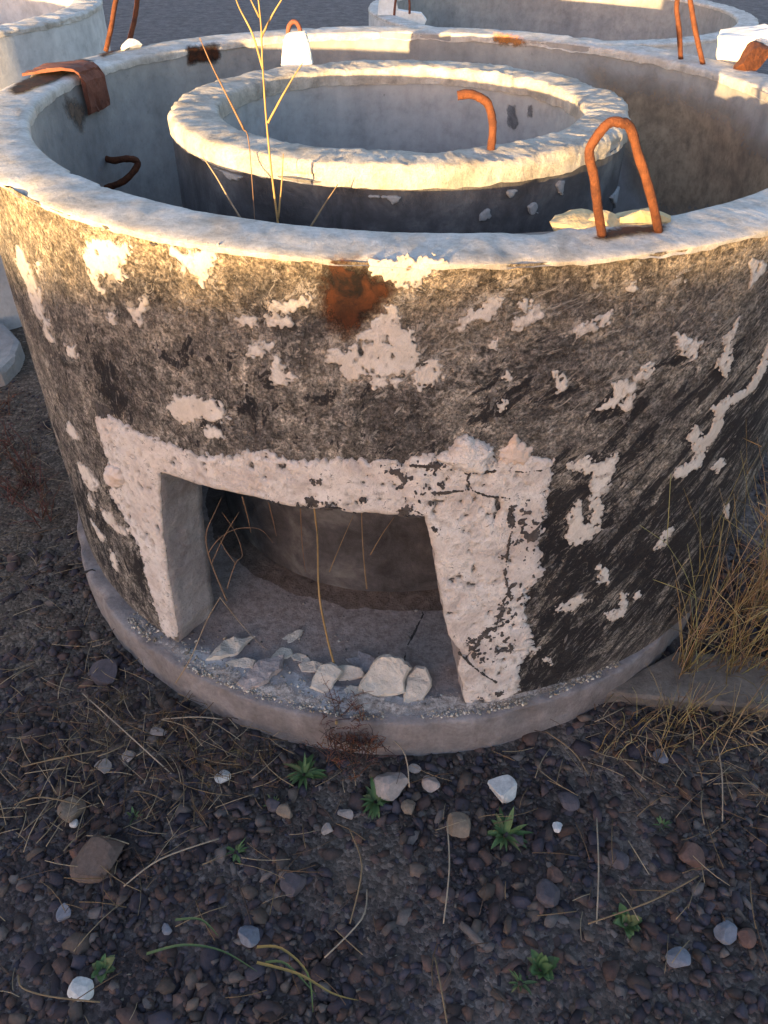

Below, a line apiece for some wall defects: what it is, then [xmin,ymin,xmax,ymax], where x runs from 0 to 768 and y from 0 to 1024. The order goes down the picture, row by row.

rust [186,44,221,64]
rust [494,34,525,46]
rust [594,225,666,239]
peeling [15,244,80,360]
rust [320,258,395,339]
peeling [324,304,446,392]
peeling [166,393,232,440]
peeling [673,343,768,479]
crack [304,497,356,514]
spalling [77,414,619,715]
crack [398,464,543,651]
crack [458,651,497,684]